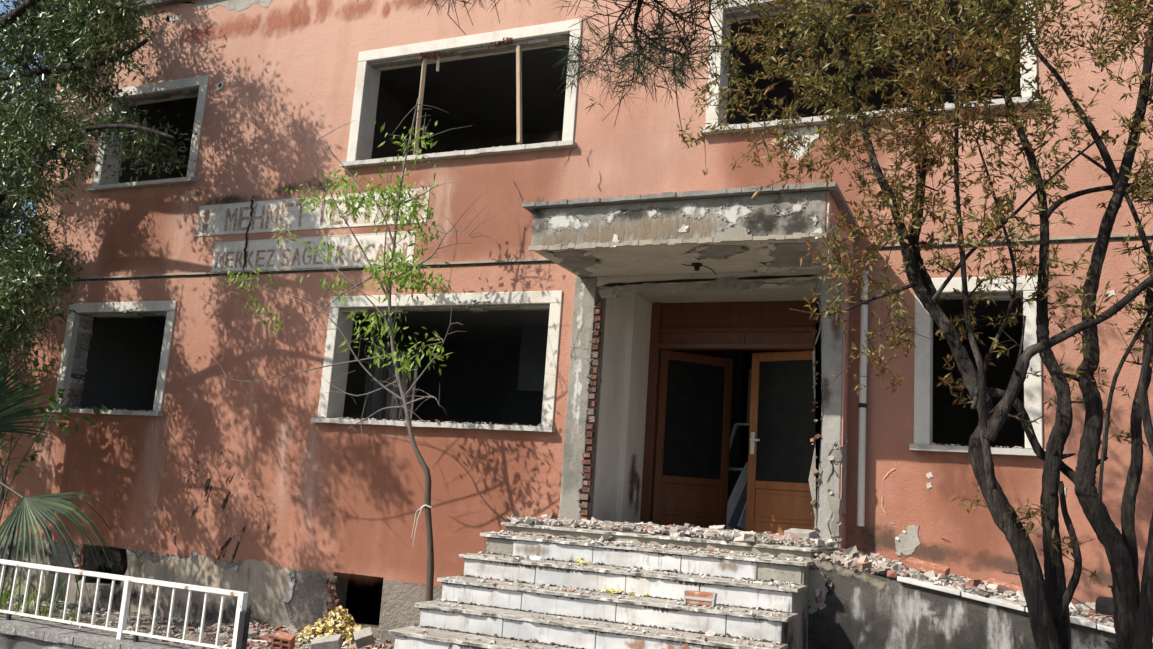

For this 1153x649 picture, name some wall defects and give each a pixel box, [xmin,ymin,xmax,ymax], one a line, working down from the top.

flaking render [165,0,272,23]
peeling [683,194,848,274]
spalling [577,298,603,520]
damp [184,451,250,518]
damp [216,514,271,563]
flaking render [0,544,86,604]
flaking render [118,547,295,627]